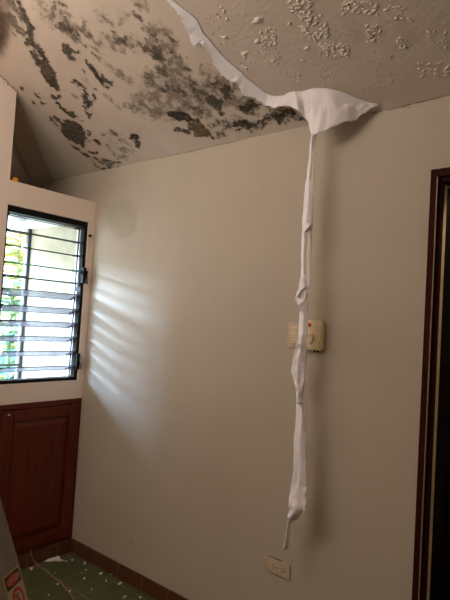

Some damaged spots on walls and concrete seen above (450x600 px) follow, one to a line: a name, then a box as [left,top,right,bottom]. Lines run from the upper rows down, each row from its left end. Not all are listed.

water stain [50,1,92,47]
water stain [112,28,308,139]
peeling [167,0,379,550]